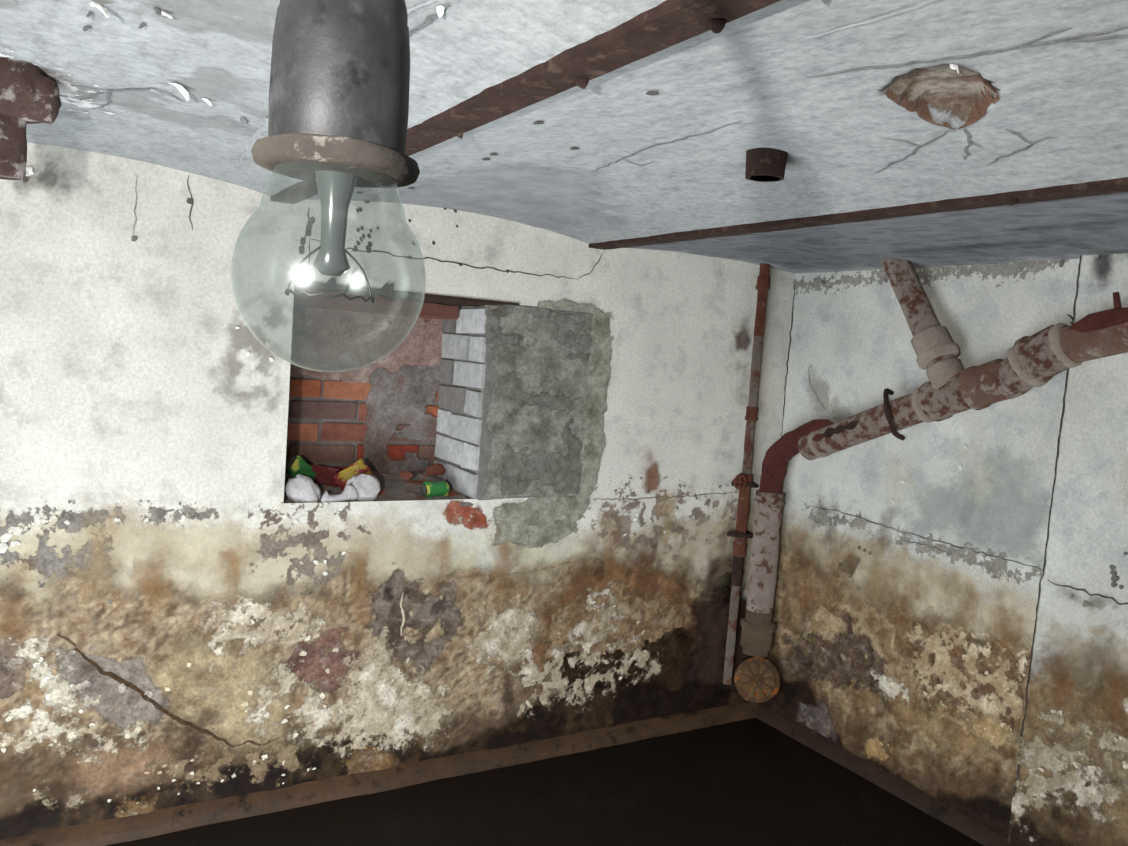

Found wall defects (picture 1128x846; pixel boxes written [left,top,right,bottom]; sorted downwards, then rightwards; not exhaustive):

spalling [879,64,999,129]
crack [299,207,602,280]
crack [1066,255,1082,324]
peeling [0,500,219,604]
peeling [247,502,371,603]
spalling [443,500,488,530]
peeling [802,500,883,577]
peeling [895,527,1043,584]
crack [812,368,1128,843]
crack [57,634,279,747]
water stain [0,501,1128,846]